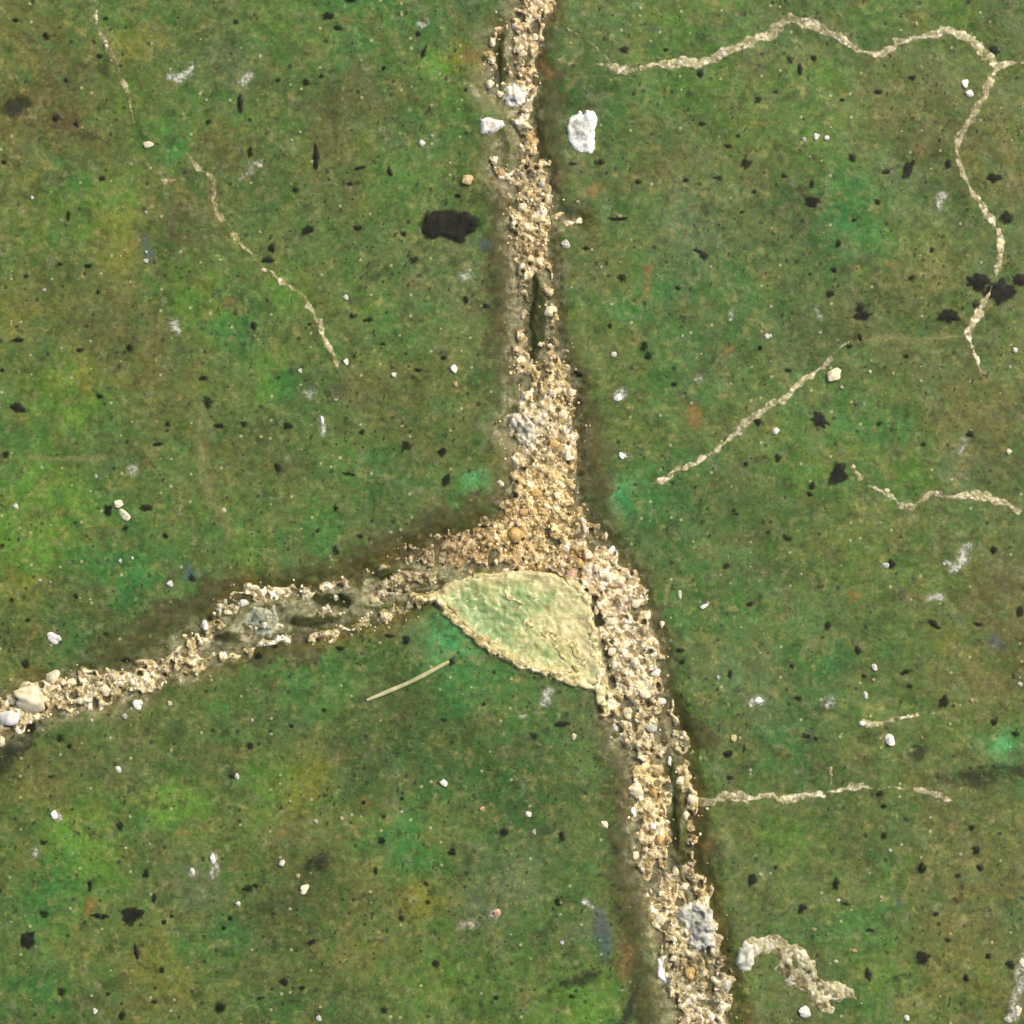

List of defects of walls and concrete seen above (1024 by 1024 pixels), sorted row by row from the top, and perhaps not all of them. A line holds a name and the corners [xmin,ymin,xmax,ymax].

crack [92,0,132,114]
crack [147,157,251,253]
crack [569,13,1024,373]
crack [269,270,338,367]
crack [366,0,849,1024]
crack [852,465,1021,515]
crack [0,578,373,736]
crack [830,782,870,793]
crack [888,787,952,803]
peeling [736,941,754,973]